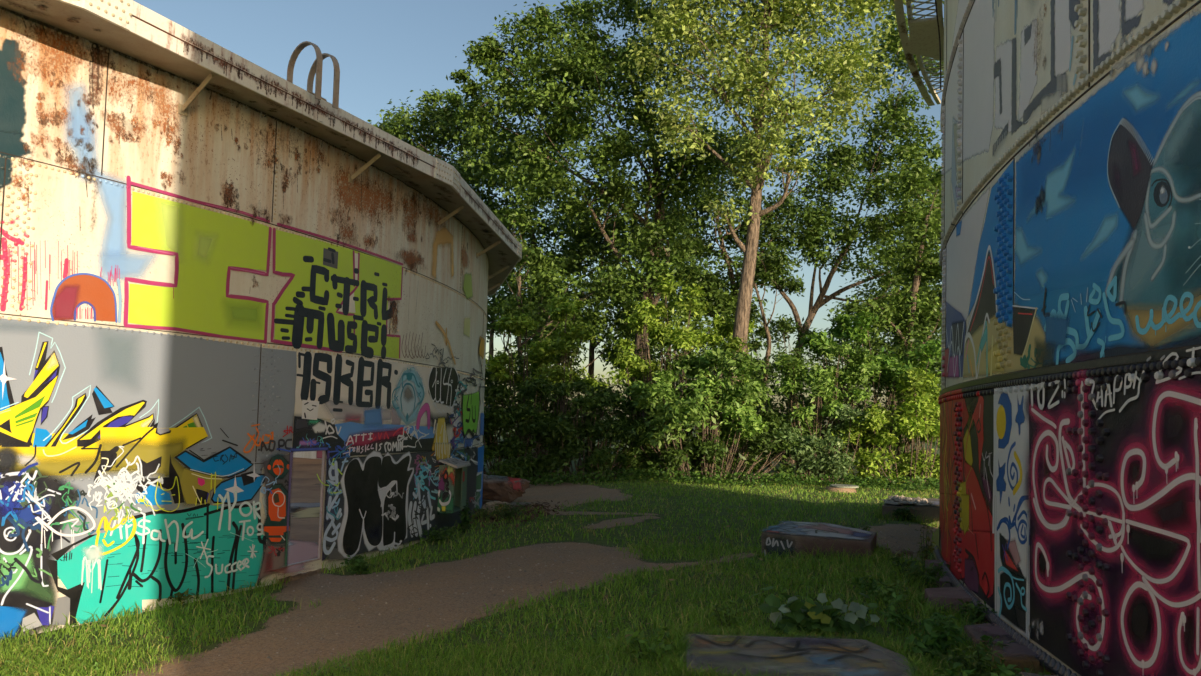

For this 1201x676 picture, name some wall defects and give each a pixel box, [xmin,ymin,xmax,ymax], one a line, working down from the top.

rust [6,0,183,206]
rust [182,35,516,271]